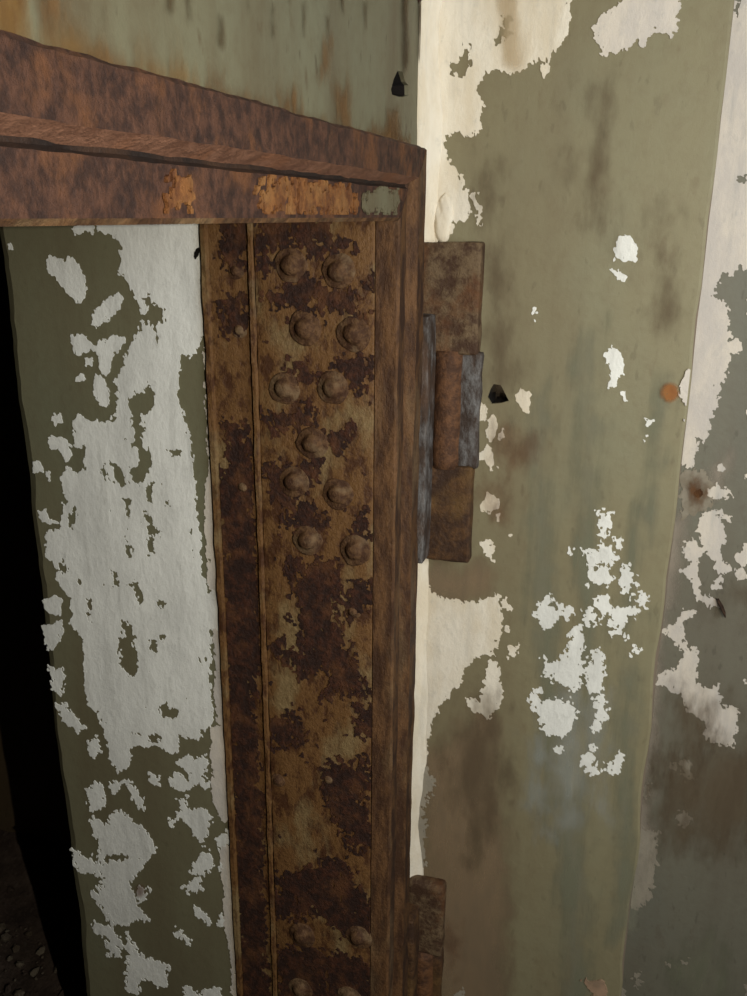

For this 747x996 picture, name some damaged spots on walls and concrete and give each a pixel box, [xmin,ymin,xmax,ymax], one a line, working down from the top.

rust [162,169,196,214]
rust [213,174,375,342]
rust [281,351,374,406]
peeling [438,0,572,235]
peeling [603,345,628,402]
peeling [609,235,638,282]
peeling [591,0,681,57]
peeling [655,0,747,749]
peeling [32,224,238,996]
rust [219,397,373,996]
peeling [418,584,520,868]
peeling [526,508,650,777]